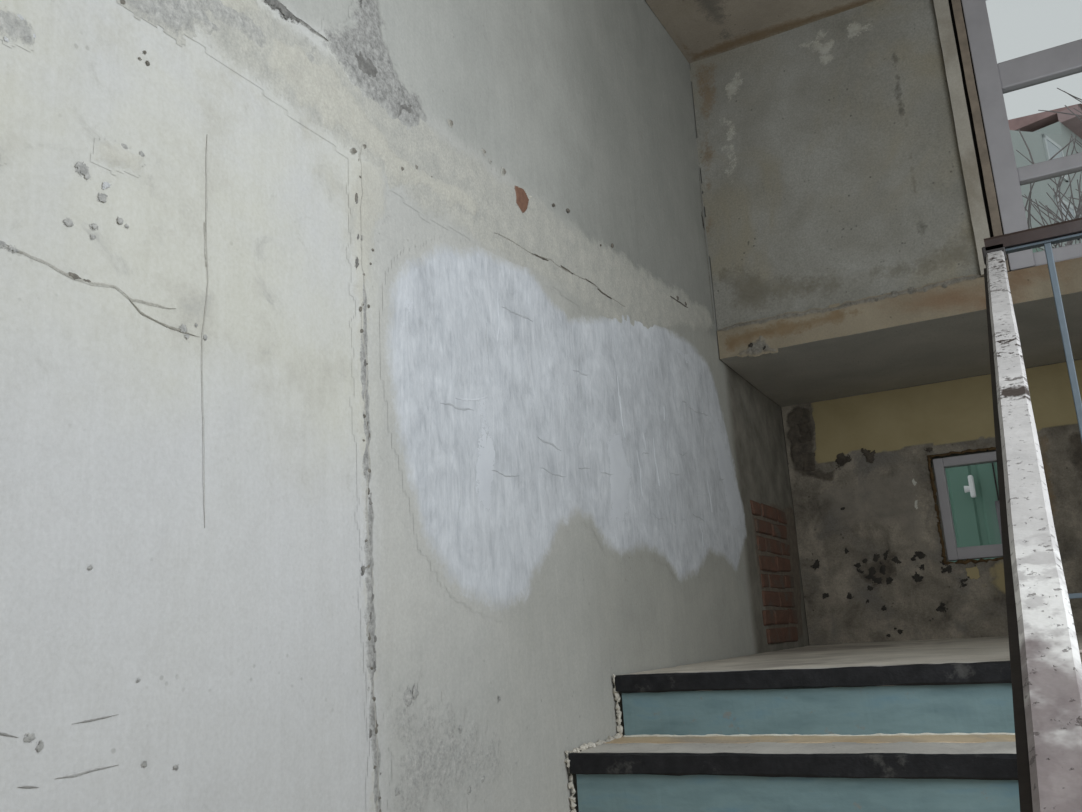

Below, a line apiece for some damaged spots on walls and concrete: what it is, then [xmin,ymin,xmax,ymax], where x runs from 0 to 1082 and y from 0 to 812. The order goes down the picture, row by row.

crack [264,0,328,41]
crack [0,140,209,528]
crack [496,233,625,307]
crack [346,143,391,812]
water stain [712,415,740,533]
peeling [785,374,995,561]
peeling [1025,360,1082,492]
peeling [966,559,1006,600]